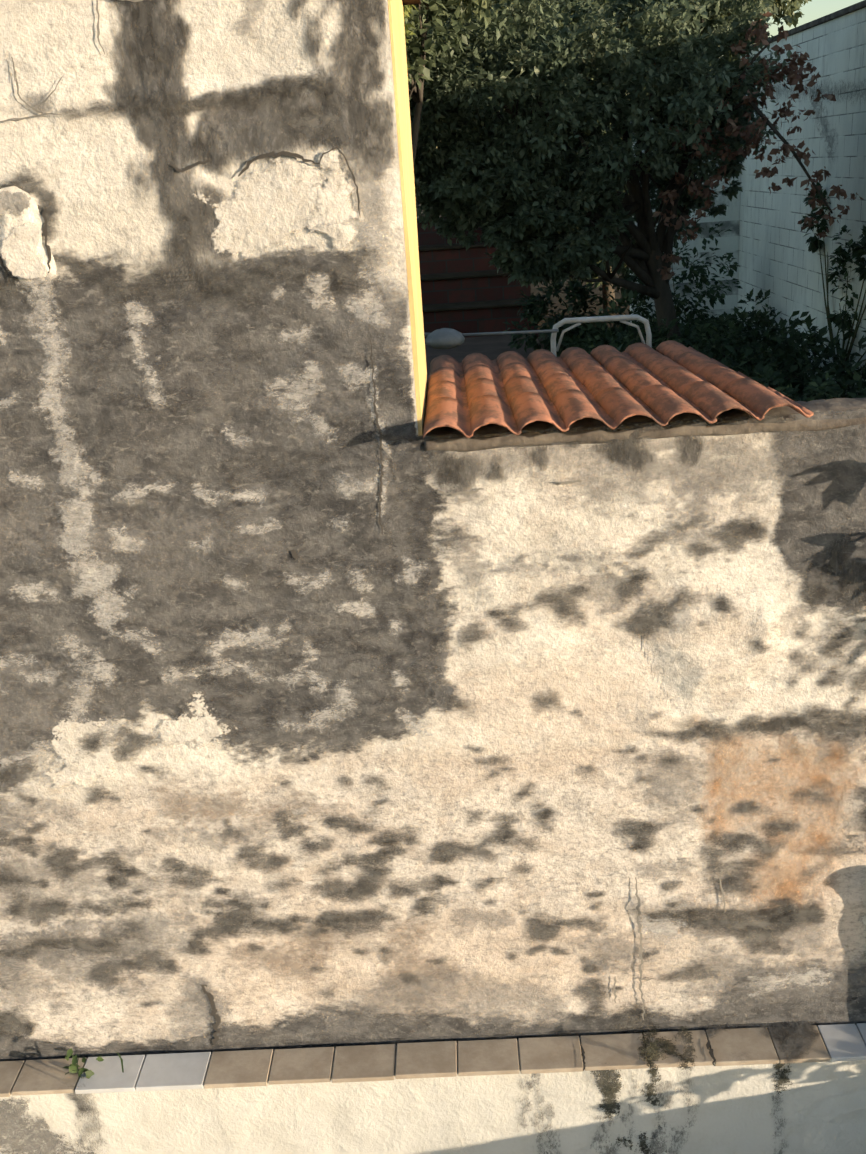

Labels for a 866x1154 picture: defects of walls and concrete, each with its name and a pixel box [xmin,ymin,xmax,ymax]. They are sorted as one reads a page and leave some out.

crack [96,0,143,54]
crack [0,57,63,122]
peeling [0,191,31,216]
peeling [192,147,384,258]
peeling [126,302,165,405]
damp [0,0,866,805]
corrosion [733,801,761,814]
damp [0,824,150,941]
damp [157,789,458,996]
corrosion [705,820,800,895]
crack [201,985,221,1046]
damp [590,1070,677,1154]